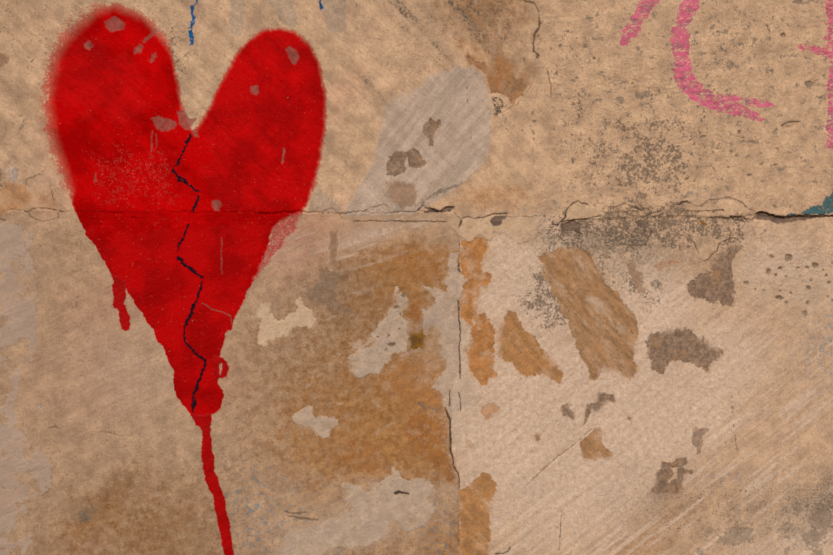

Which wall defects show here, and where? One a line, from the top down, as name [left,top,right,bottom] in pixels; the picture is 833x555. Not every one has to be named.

crack [521,0,553,100]
crack [0,173,62,223]
crack [309,211,538,275]
spalling [424,205,455,214]
peeling [490,214,508,227]
peeling [686,235,745,312]
peeling [457,235,564,390]
peeling [533,200,727,464]
crack [444,299,462,545]
peeling [647,426,710,503]
peeling [454,470,498,555]